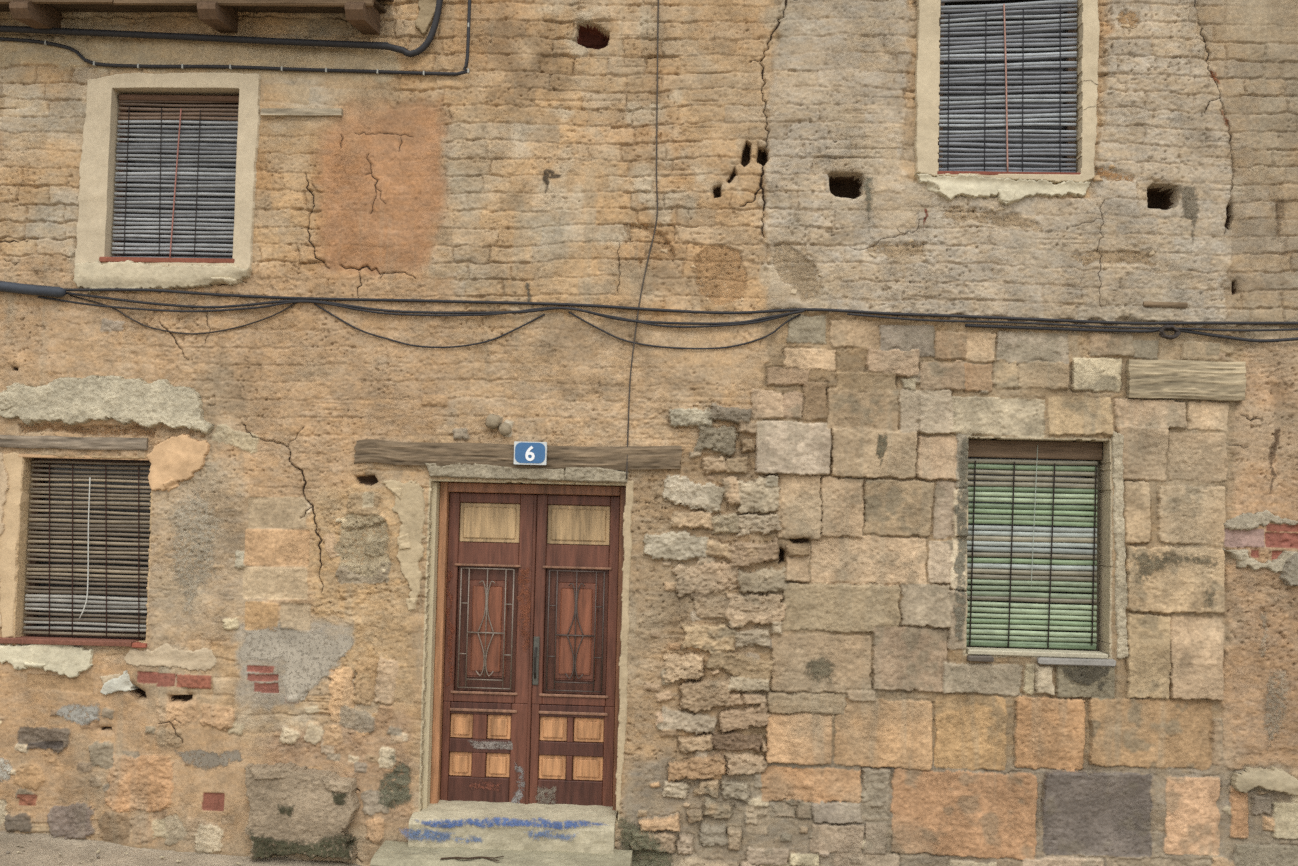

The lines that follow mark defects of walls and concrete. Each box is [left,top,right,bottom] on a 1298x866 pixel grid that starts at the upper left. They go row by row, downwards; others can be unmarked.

crack [740,0,787,237]
crack [242,423,323,593]
flaking render [1223,510,1298,531]
flaking render [1222,548,1297,573]
flaking render [0,643,217,695]